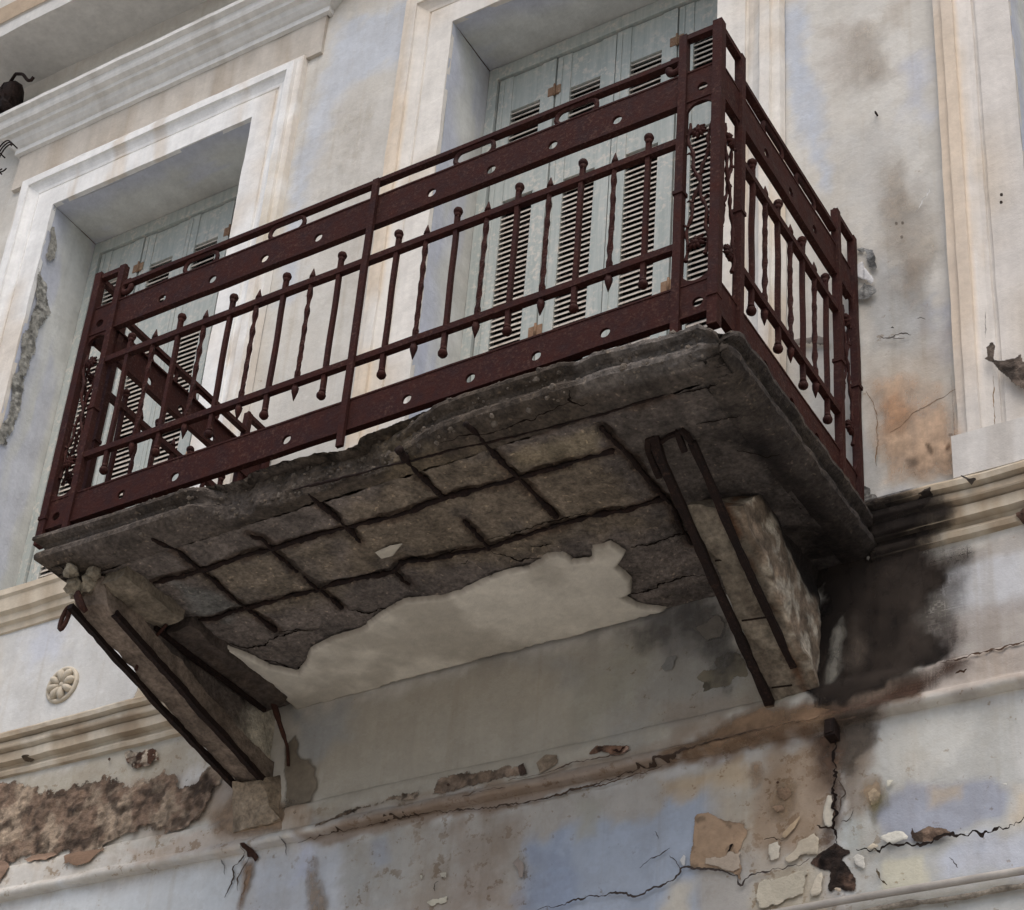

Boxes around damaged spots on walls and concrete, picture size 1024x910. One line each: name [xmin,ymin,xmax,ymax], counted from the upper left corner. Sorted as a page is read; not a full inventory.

peeling [857,247,877,299]
crack [866,387,955,466]
spalling [63,367,841,671]
water stain [807,490,973,715]
crack [941,641,1024,674]
flaking render [0,748,221,879]
flaking render [433,754,558,795]
crack [538,832,808,910]
flaking render [680,812,747,879]
flaking render [756,816,841,908]
flaking render [823,795,834,827]
crack [817,740,1024,885]